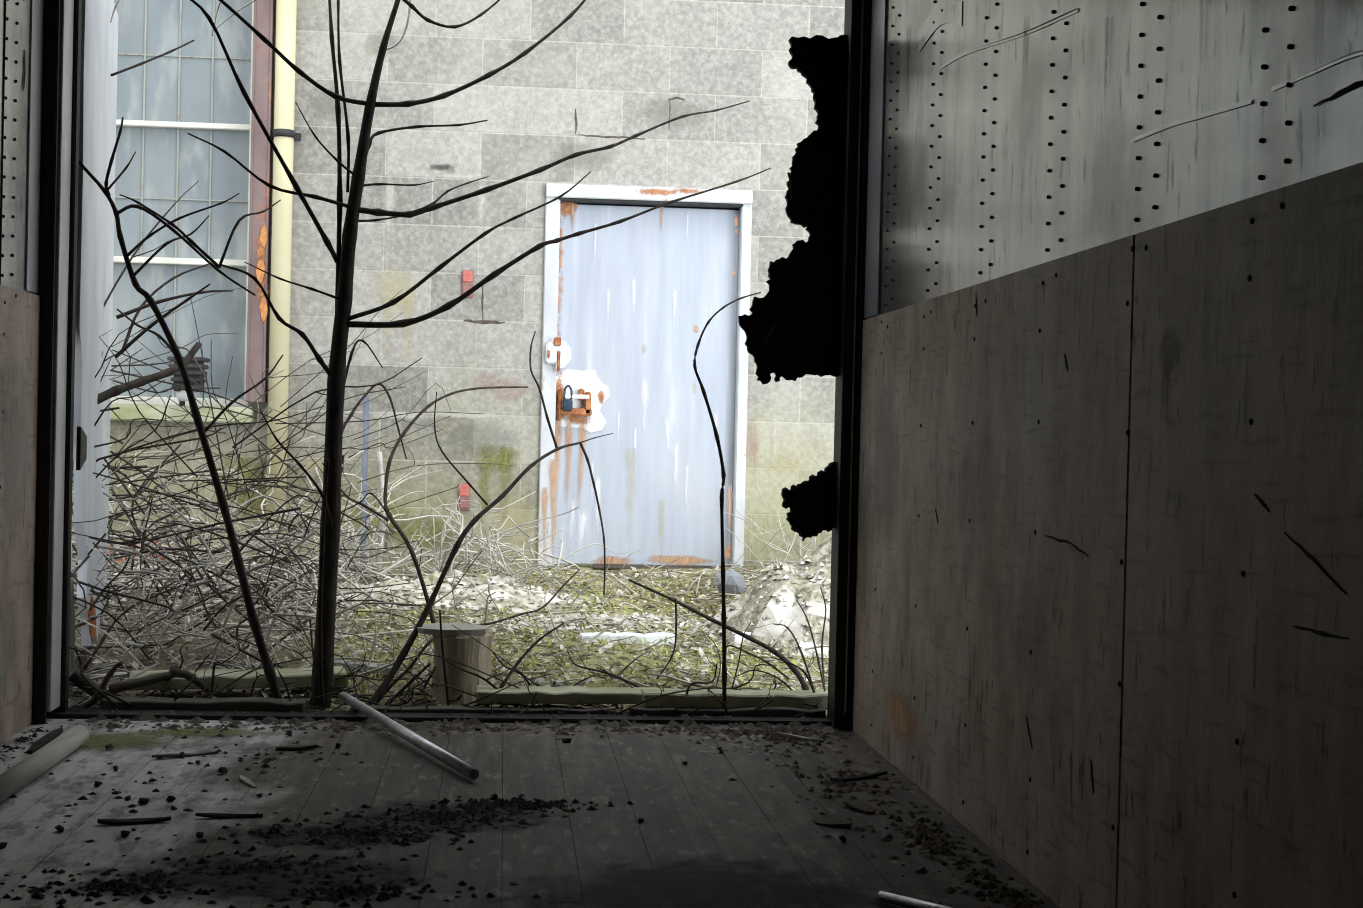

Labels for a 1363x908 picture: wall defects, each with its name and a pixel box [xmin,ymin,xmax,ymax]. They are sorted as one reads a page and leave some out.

corrosion [256,224,268,322]
corrosion [542,373,587,545]
corrosion [598,556,627,564]
corrosion [651,556,708,565]